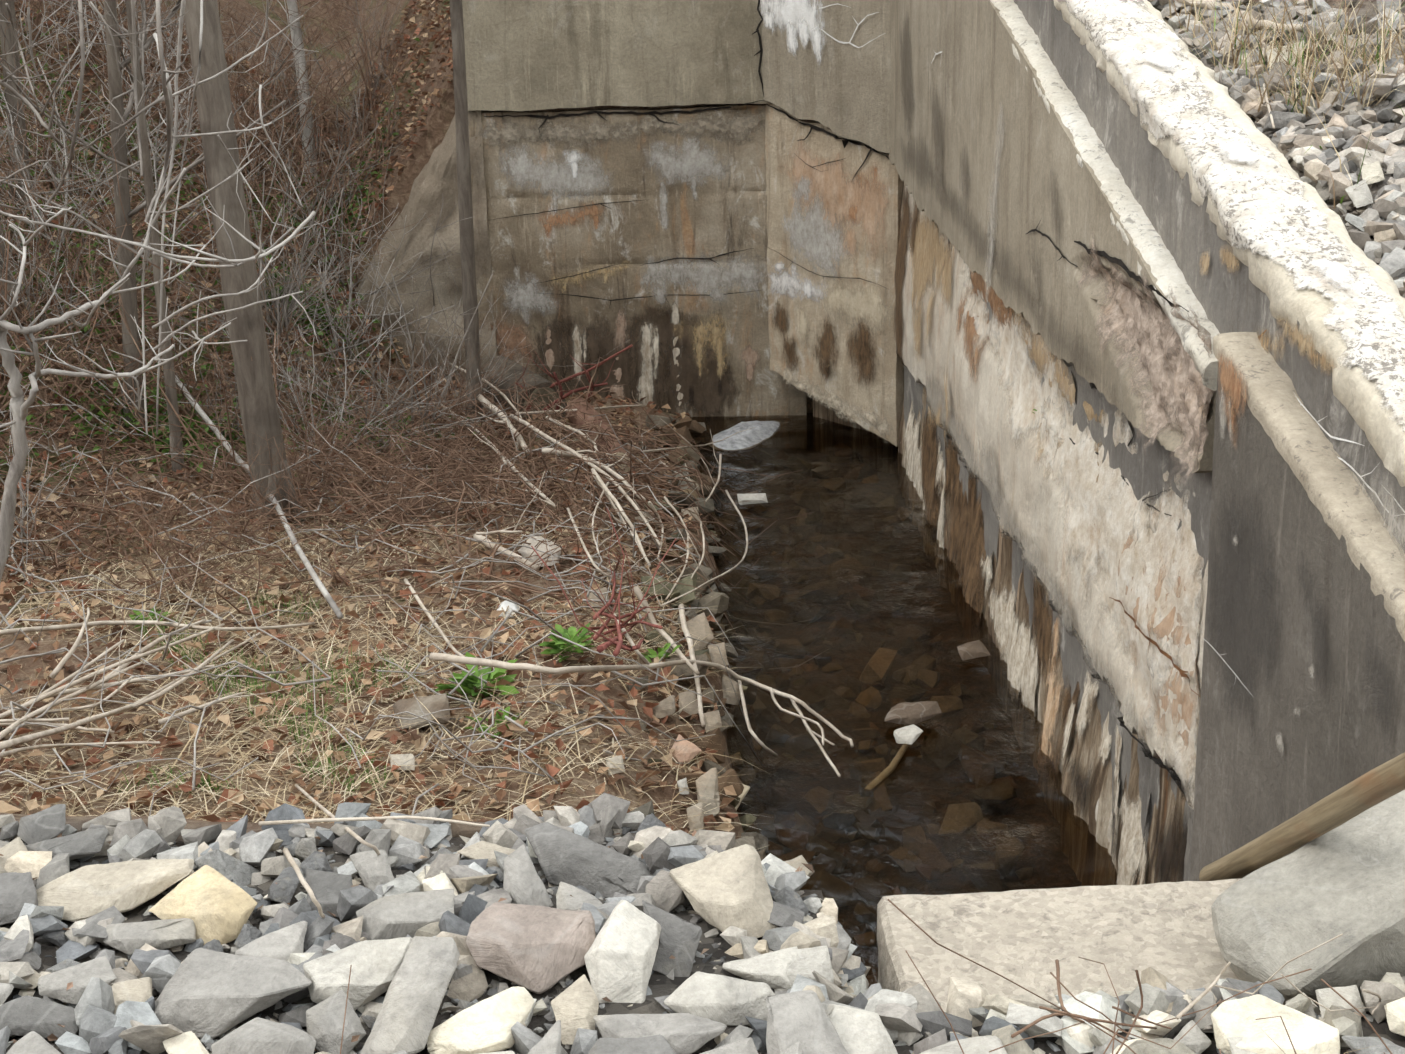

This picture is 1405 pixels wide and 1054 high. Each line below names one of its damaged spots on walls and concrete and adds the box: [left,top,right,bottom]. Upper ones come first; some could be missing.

crack [484,0,889,182]
water stain [503,146,609,212]
water stain [650,138,725,228]
water stain [782,178,849,275]
water stain [894,186,918,367]
crack [1026,220,1189,312]
water stain [505,258,762,417]
water stain [772,301,798,367]
water stain [815,321,875,385]
corrosion [910,217,1104,458]
corrosion [1118,535,1191,646]
corrosion [1155,663,1197,746]